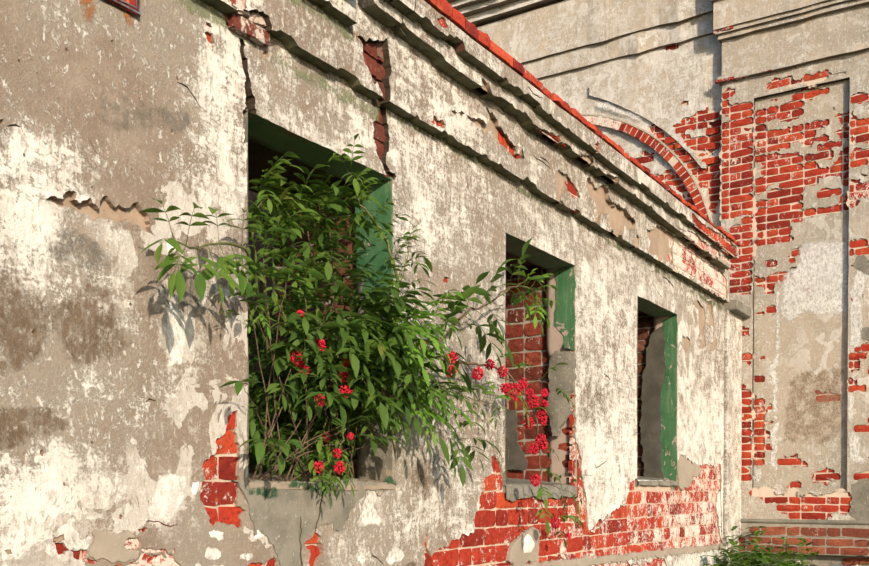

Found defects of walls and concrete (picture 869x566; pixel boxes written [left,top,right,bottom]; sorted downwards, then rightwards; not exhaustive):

crack [363,42,392,178]
flaking render [451,106,525,159]
flaking render [46,192,147,232]
flaking render [556,69,869,353]
flaking render [742,352,766,366]
flaking render [815,340,869,403]
flaking render [200,411,244,528]
flaking render [424,395,721,566]
flaking render [741,375,852,525]
flaking render [853,418,869,433]
flaking render [53,521,179,566]
flaking render [305,533,320,566]